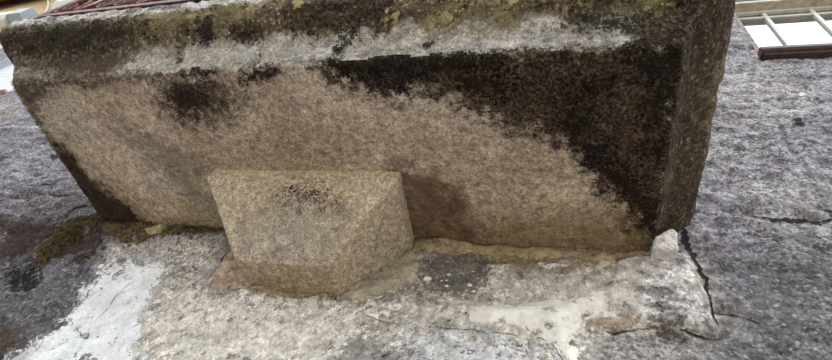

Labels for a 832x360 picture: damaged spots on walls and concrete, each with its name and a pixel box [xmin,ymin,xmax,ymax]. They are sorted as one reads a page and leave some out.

damp [0,11,265,224]
damp [270,0,723,248]
crack [752,208,832,225]
crack [586,327,659,335]
crack [680,228,760,340]